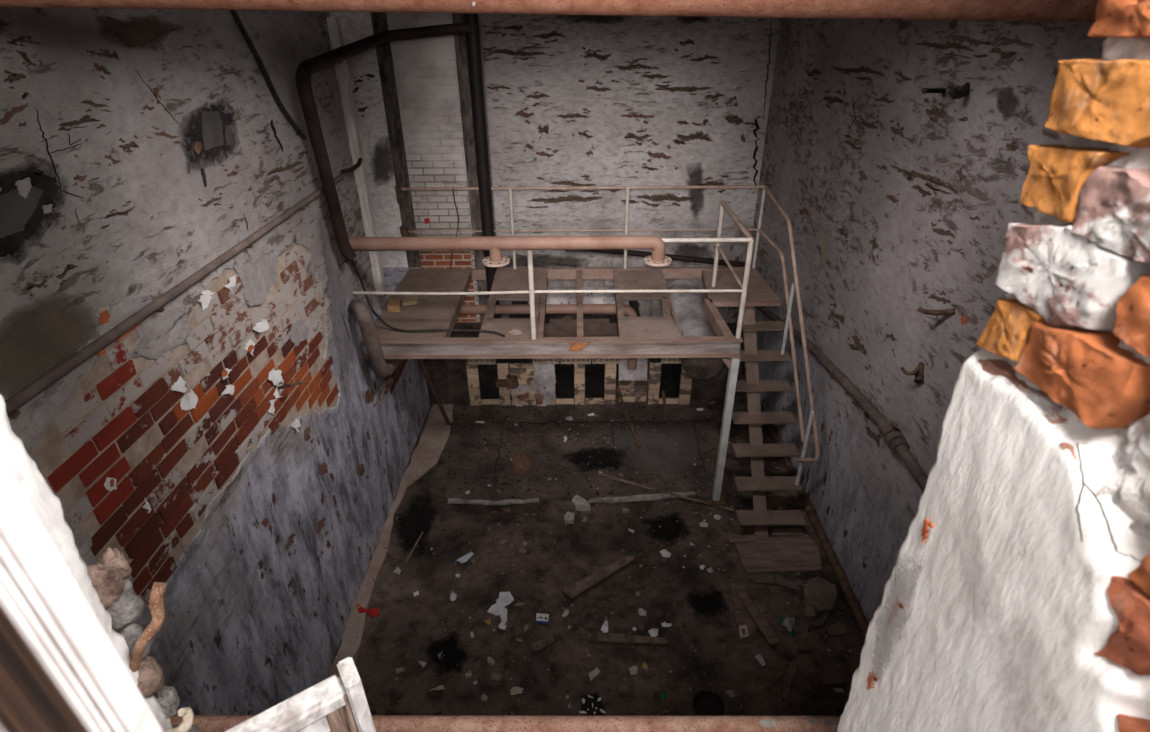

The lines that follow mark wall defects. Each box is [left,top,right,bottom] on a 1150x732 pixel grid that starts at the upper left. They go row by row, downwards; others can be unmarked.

crack [37,110,85,233]
peeling [486,84,595,160]
peeling [527,174,691,208]
peeling [578,46,755,173]
crack [750,18,772,190]
peeling [877,164,967,204]
flaking render [976,0,1150,540]
flaking render [12,229,342,624]
flaking render [510,364,556,406]
crack [1075,443,1143,562]
flaking render [1094,554,1150,675]
flaking render [1117,714,1150,732]